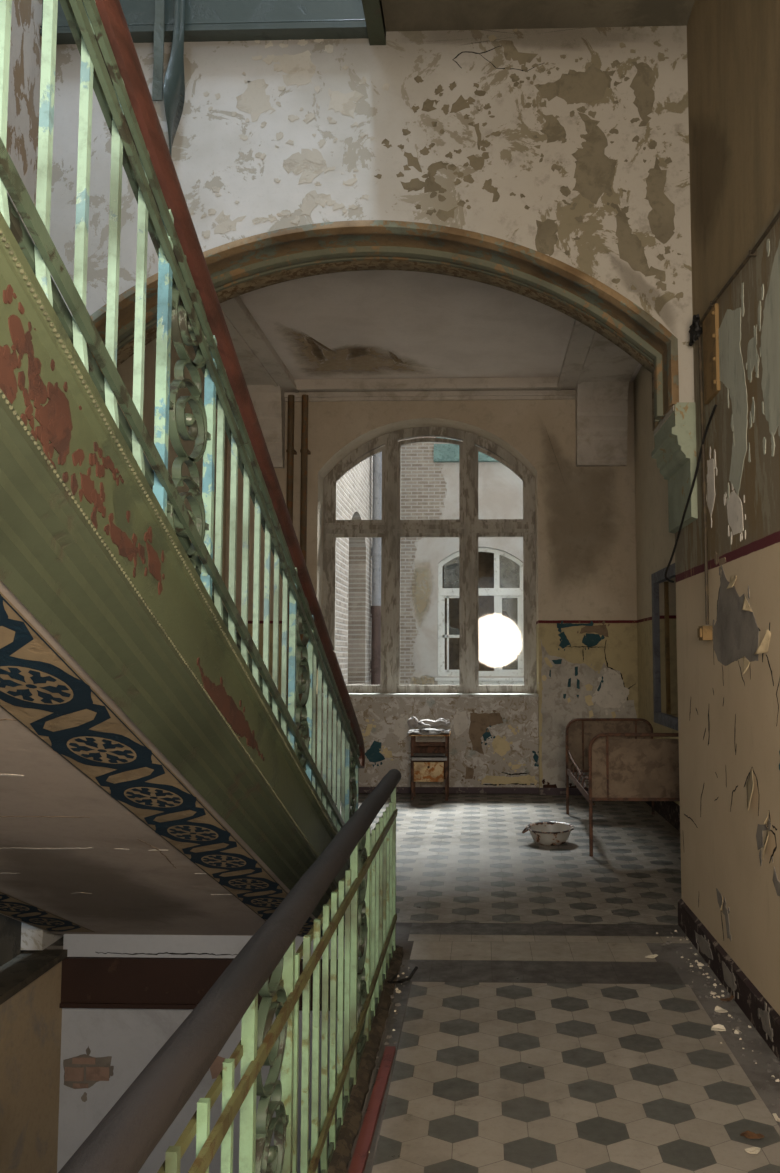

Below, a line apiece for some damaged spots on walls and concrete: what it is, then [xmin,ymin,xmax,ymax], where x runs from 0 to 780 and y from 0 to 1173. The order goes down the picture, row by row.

peeling [188,39,369,238]
peeling [382,81,580,256]
peeling [488,29,683,301]
peeling [706,239,780,544]
peeling [713,565,759,674]
peeling [362,719,385,767]
peeling [462,621,637,788]
peeling [756,818,780,896]
flaking render [63,1046,114,1102]